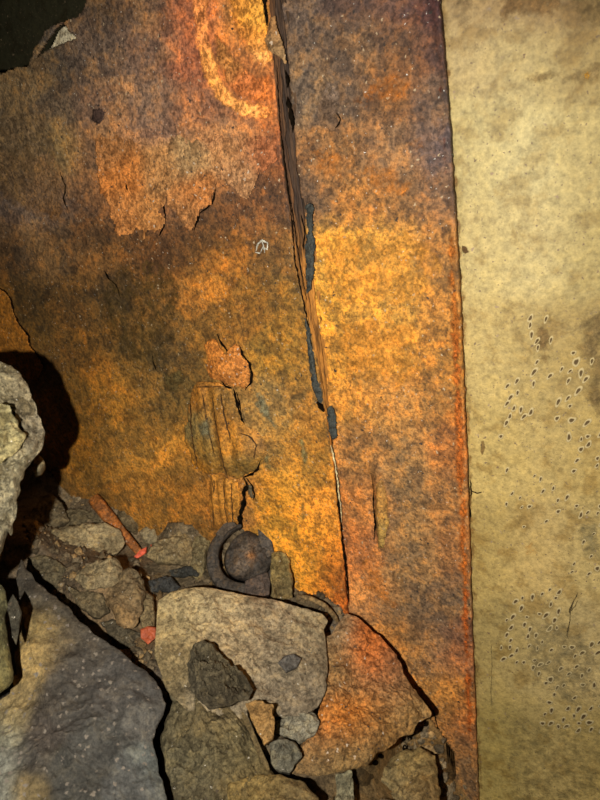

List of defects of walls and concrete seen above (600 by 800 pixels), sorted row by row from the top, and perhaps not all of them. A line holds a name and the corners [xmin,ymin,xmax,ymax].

rust [92,108,106,125]
rust [192,0,273,119]
crack [261,0,269,25]
peeling [95,133,278,240]
crack [276,66,317,377]
water stain [538,328,548,347]
water stain [579,316,600,414]
rust [448,272,476,657]
crack [335,478,349,607]
rust [292,613,432,776]